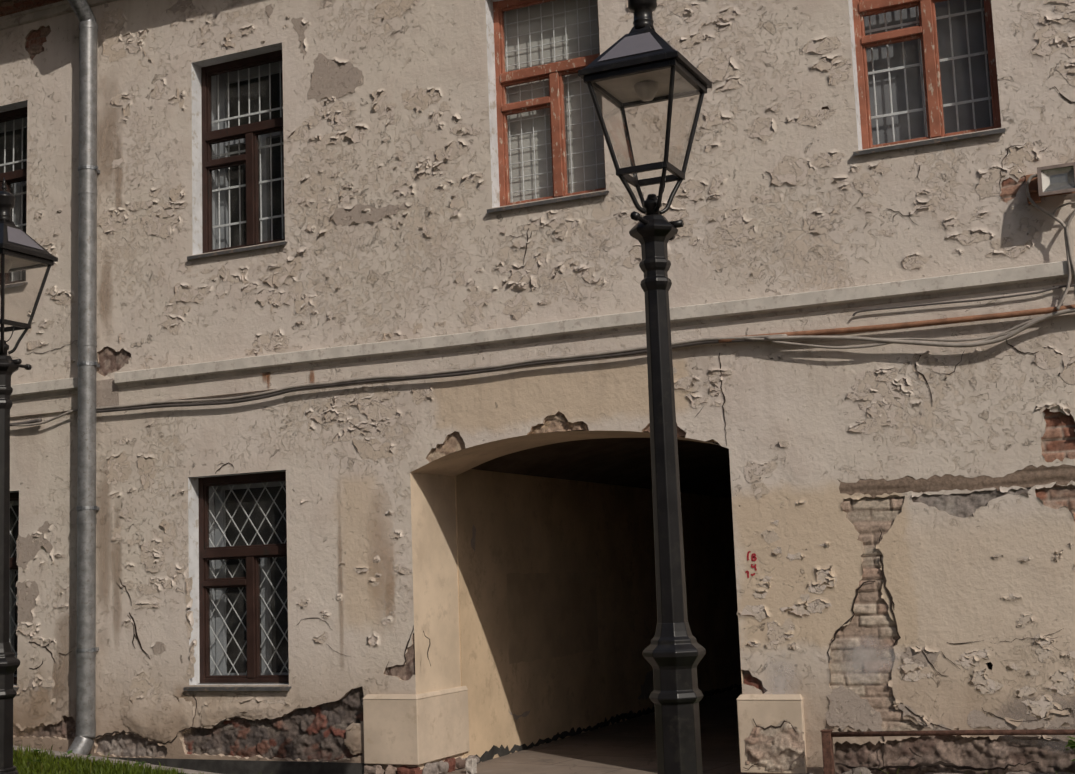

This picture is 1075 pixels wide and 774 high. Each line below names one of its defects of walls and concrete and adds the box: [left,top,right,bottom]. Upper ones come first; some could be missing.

peeling [160,15,488,356]
peeling [907,142,1048,261]
peeling [452,208,607,326]
flaking render [97,332,131,376]
flaking render [428,432,465,462]
flaking render [530,412,589,434]
crack [692,353,727,446]
flaking render [1035,401,1075,464]
crack [116,578,150,659]
peeling [737,520,838,653]
flaking render [823,482,1075,774]
flaking render [183,687,364,762]